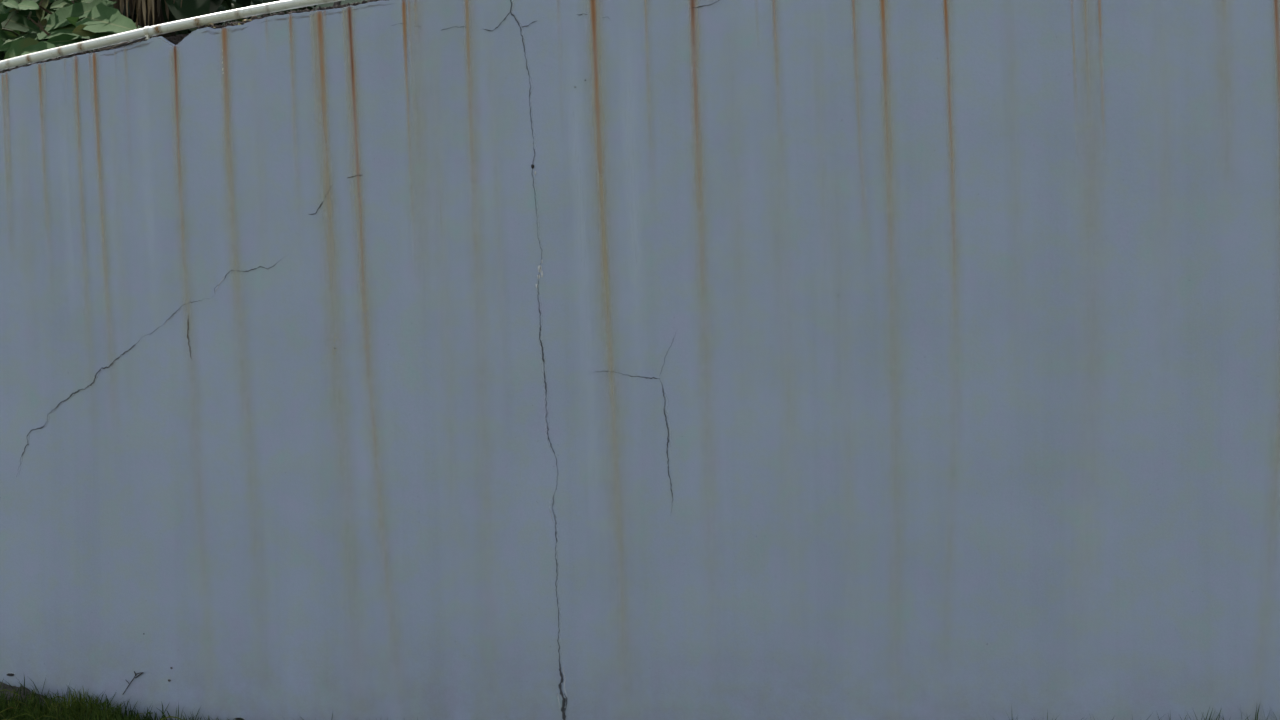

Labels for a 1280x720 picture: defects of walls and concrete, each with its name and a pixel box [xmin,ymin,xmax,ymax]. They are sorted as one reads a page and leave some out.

rust [313,10,327,141]
rust [343,6,366,312]
crack [442,0,547,392]
rust [590,0,608,303]
rust [690,0,702,186]
rust [880,0,892,169]
rust [944,0,953,164]
crack [16,255,288,477]
crack [596,371,673,510]
crack [555,532,568,720]